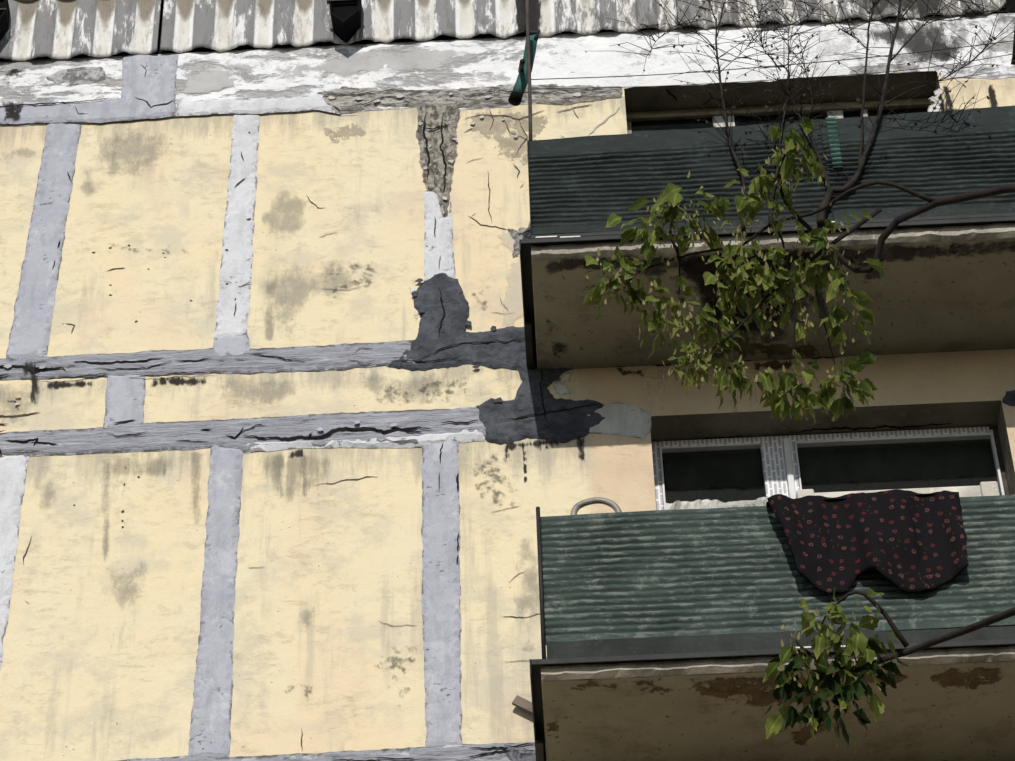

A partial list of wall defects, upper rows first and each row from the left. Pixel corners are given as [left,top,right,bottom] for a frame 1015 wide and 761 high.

spalling [46,67,107,87]
peeling [180,64,252,94]
spalling [278,45,623,217]
crack [465,104,621,177]
crack [467,158,504,229]
damp [890,246,957,259]
damp [628,249,880,411]
crack [0,357,212,455]